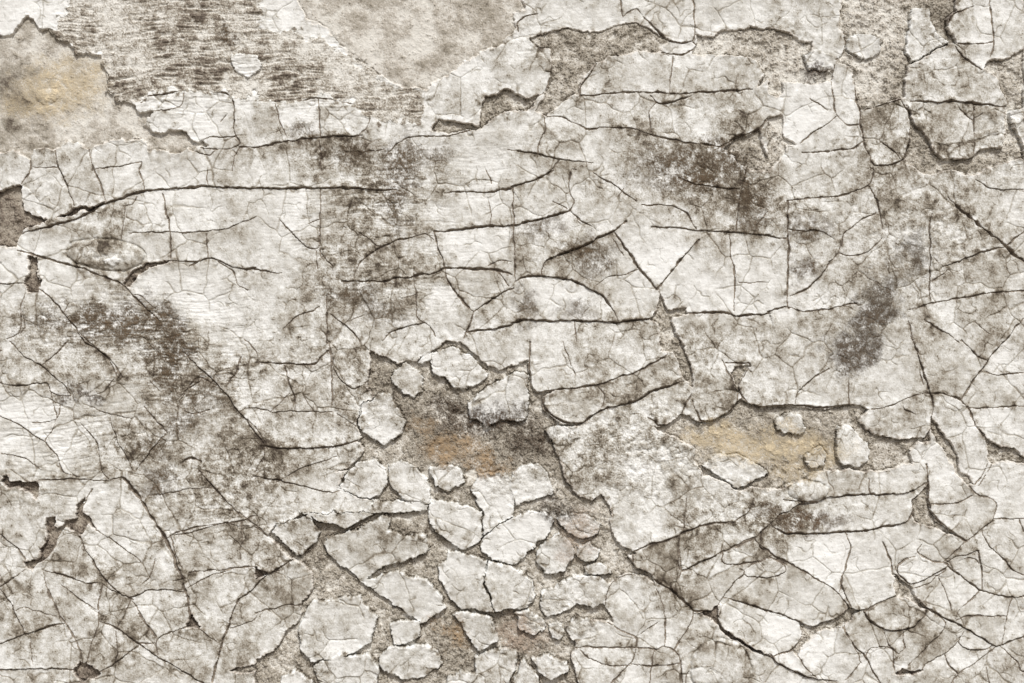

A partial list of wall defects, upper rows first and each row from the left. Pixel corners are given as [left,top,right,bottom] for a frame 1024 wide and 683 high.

peeling [0,0,670,161]
crack [17,0,1006,426]
crack [975,179,1024,191]
crack [0,282,367,683]
spalling [228,339,655,683]
crack [575,197,1024,683]
spalling [652,364,974,492]